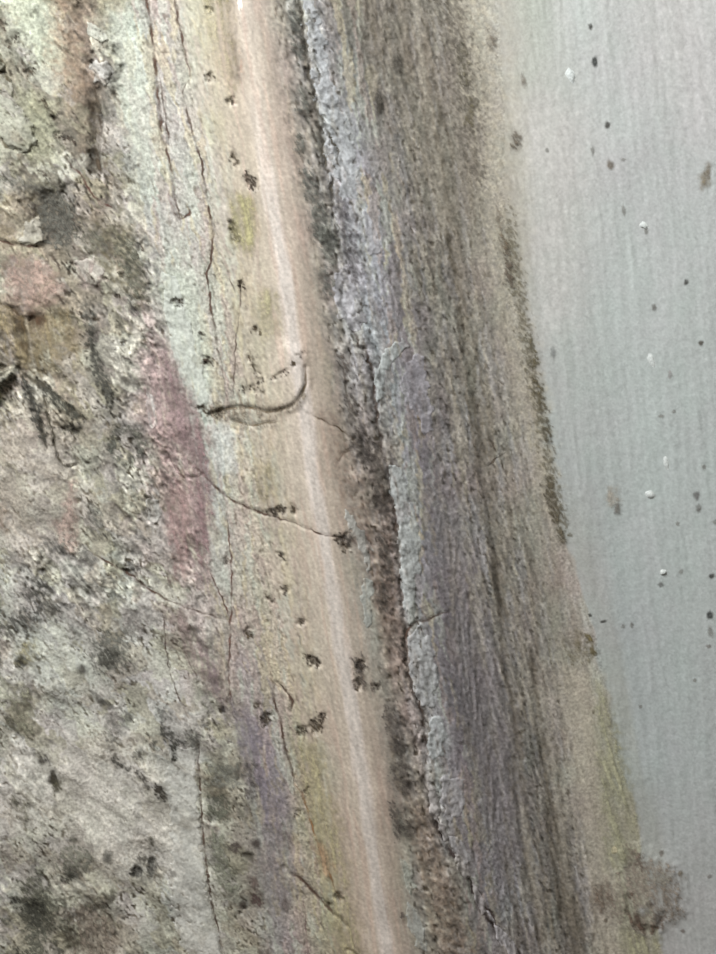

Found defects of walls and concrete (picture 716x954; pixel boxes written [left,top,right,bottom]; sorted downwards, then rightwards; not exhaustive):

crack [145,0,241,326]
crack [298,0,340,195]
crack [223,373,306,426]
crack [171,451,285,520]
crack [100,557,169,667]
crack [196,529,233,696]